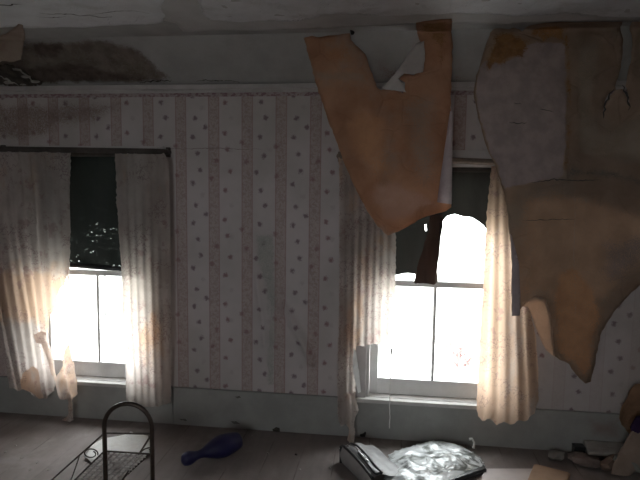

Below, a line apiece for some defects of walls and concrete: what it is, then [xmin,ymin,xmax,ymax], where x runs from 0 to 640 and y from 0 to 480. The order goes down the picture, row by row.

peeling [0,24,43,86]
leakage [0,39,168,85]